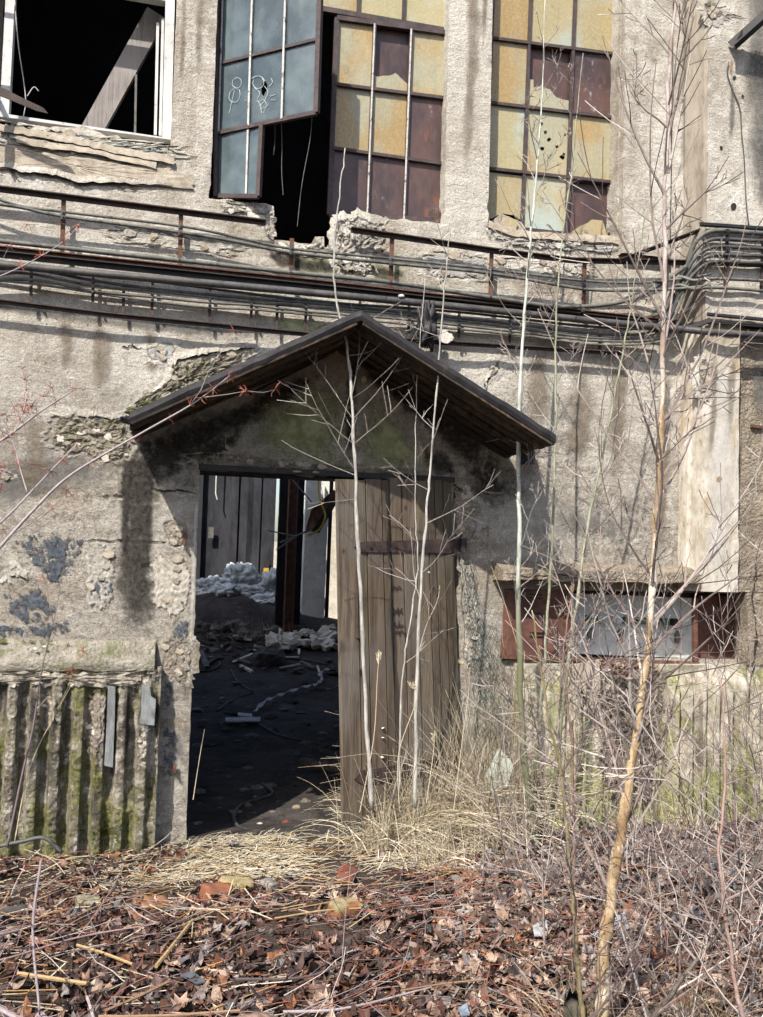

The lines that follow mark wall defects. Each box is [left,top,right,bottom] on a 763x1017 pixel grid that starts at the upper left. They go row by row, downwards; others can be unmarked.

peeling [0,119,198,172]
damp [747,29,763,195]
spalling [218,199,397,285]
spalling [35,333,262,471]
spalling [0,465,18,486]
damp [116,449,158,624]
spalling [0,509,200,759]
damp [121,695,130,766]